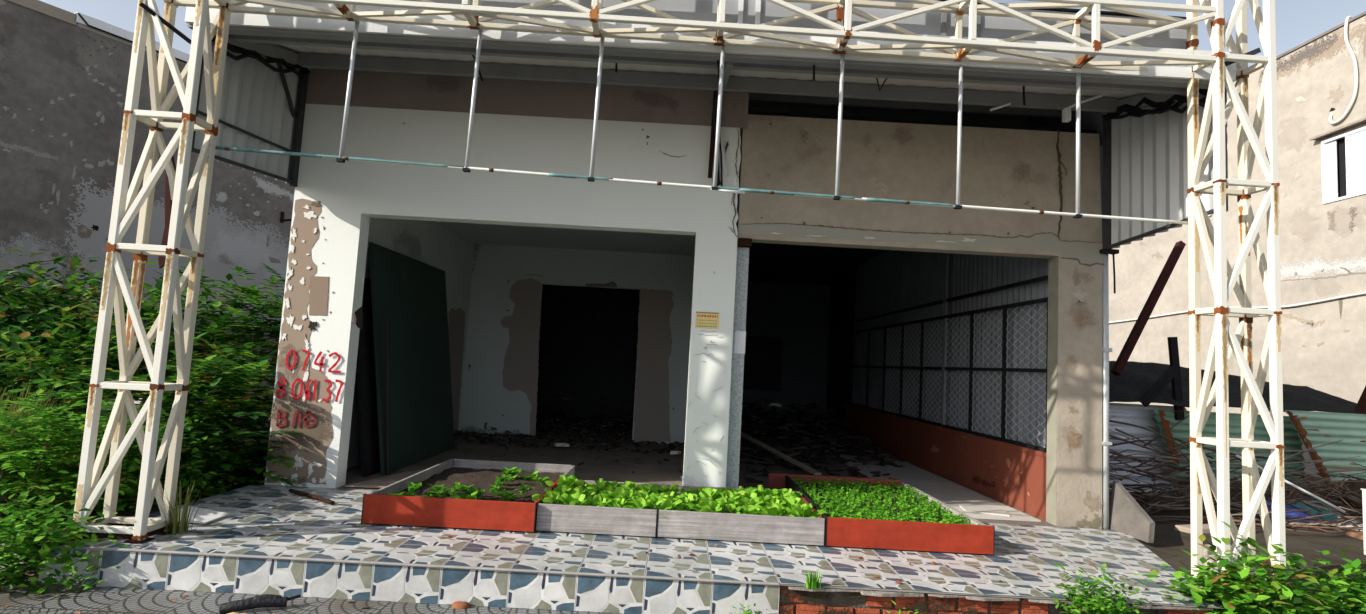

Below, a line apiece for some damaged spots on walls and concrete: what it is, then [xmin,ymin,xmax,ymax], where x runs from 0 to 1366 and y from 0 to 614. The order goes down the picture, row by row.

rust [101,242,148,349]
rust [119,110,133,165]
rust [159,248,204,331]
flaking render [206,176,333,485]
flaking render [501,278,542,436]
flaking render [634,288,691,442]
rust [832,5,852,54]
crack [729,128,1103,266]
rust [1186,0,1249,157]
rust [1187,179,1251,272]
rust [1188,306,1253,458]
rust [1271,183,1280,235]